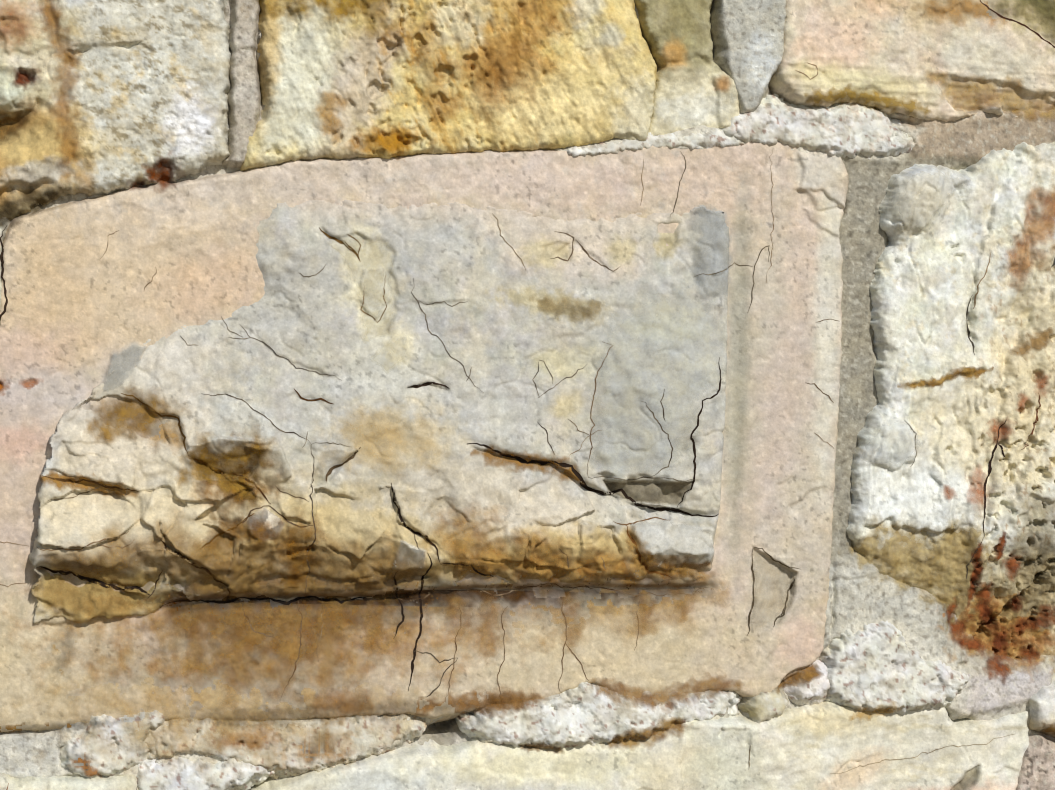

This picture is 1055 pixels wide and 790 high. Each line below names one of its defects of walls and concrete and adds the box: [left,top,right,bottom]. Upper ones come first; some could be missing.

rust [14,70,34,86]
damp [0,189,59,226]
rust [133,159,172,187]
crack [0,226,8,321]
crack [222,318,335,404]
crack [407,290,484,393]
rust [992,424,1009,441]
crack [0,341,721,702]
crack [747,547,799,635]
rust [943,544,1055,679]
crack [966,392,1041,579]
rust [995,532,1020,577]